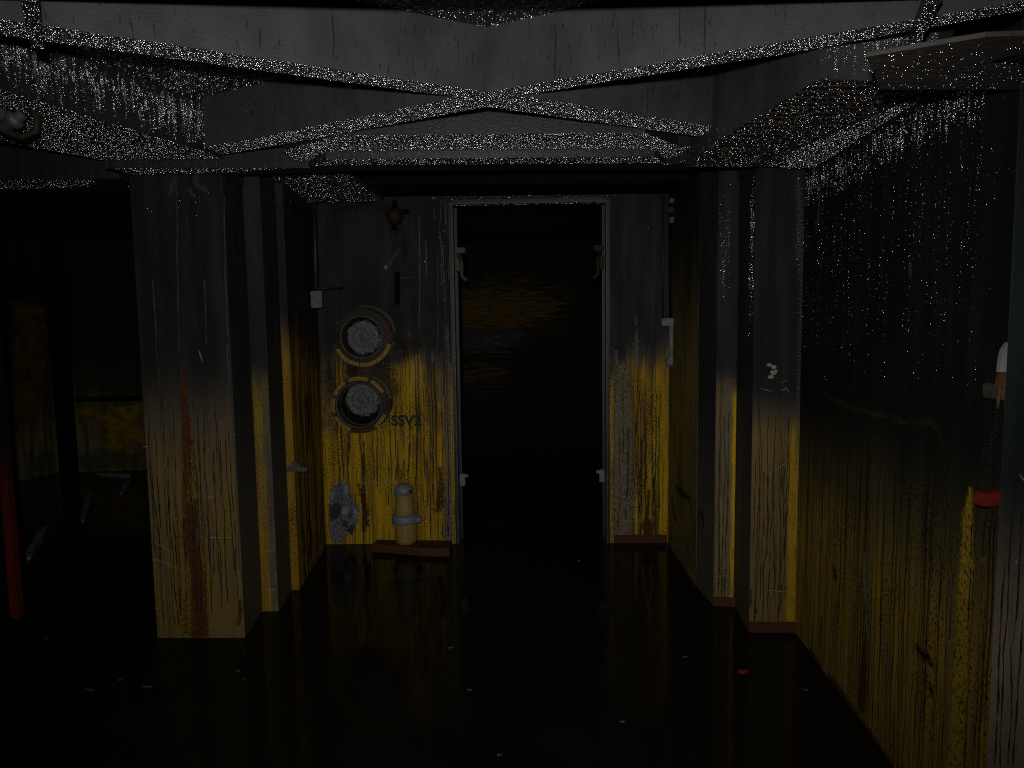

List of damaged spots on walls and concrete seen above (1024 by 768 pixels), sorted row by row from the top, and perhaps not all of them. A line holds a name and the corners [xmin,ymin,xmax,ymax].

rust [177,359,209,638]
flaking render [327,480,360,544]